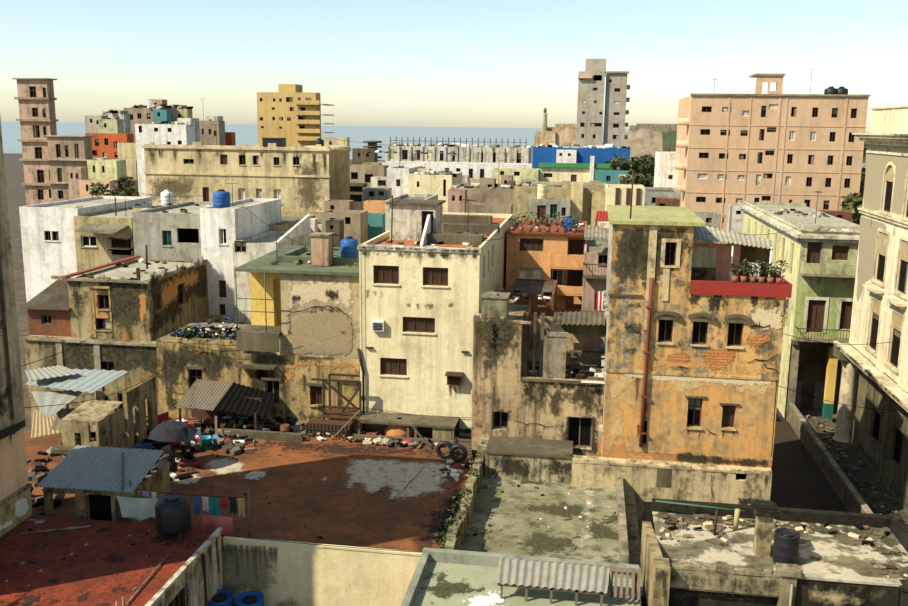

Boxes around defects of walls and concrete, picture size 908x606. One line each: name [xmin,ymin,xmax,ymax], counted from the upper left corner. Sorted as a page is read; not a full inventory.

water stain [96,256,208,335]
water stain [38,337,285,410]
peeling [286,277,354,315]
water stain [477,312,518,379]
water stain [608,227,693,308]
peeling [595,347,776,459]
water stain [689,294,728,315]
spalling [746,307,784,347]
water stain [773,299,789,327]